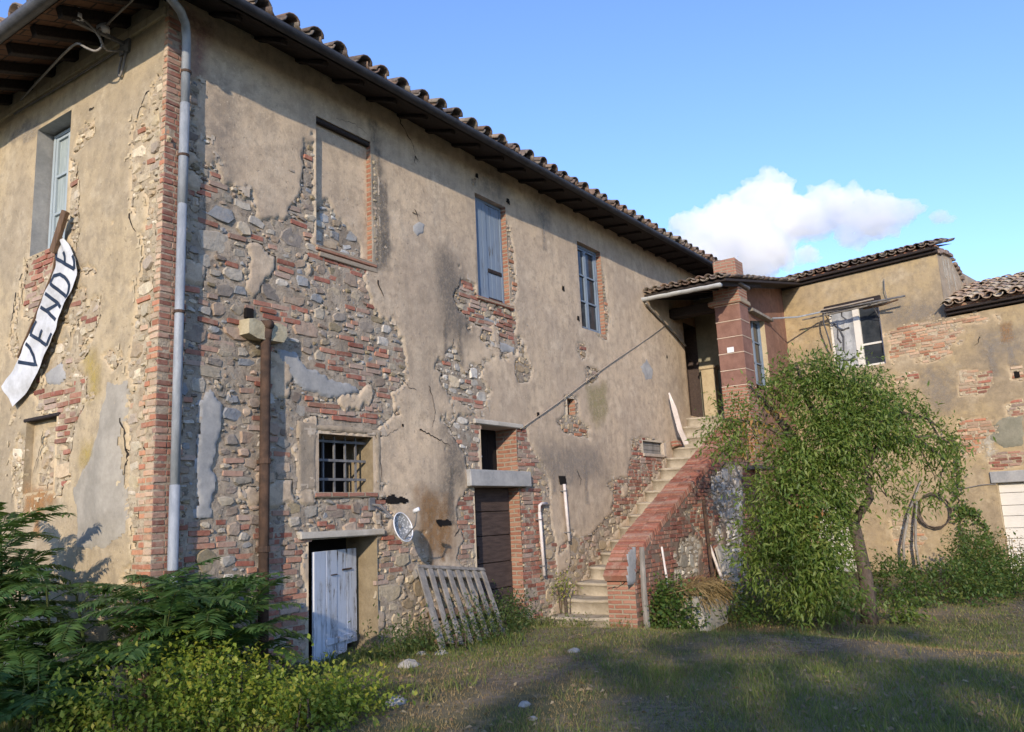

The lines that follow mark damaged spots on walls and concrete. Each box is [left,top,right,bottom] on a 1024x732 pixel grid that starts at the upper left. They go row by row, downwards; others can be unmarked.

spalling [66,117,95,252]
spalling [6,249,55,358]
spalling [5,286,101,518]
crack [119,418,145,475]
spalling [104,4,460,704]
spalling [436,224,532,469]
spalling [557,396,590,439]
spalling [884,311,1001,384]
spalling [959,370,994,398]
spalling [513,429,683,618]